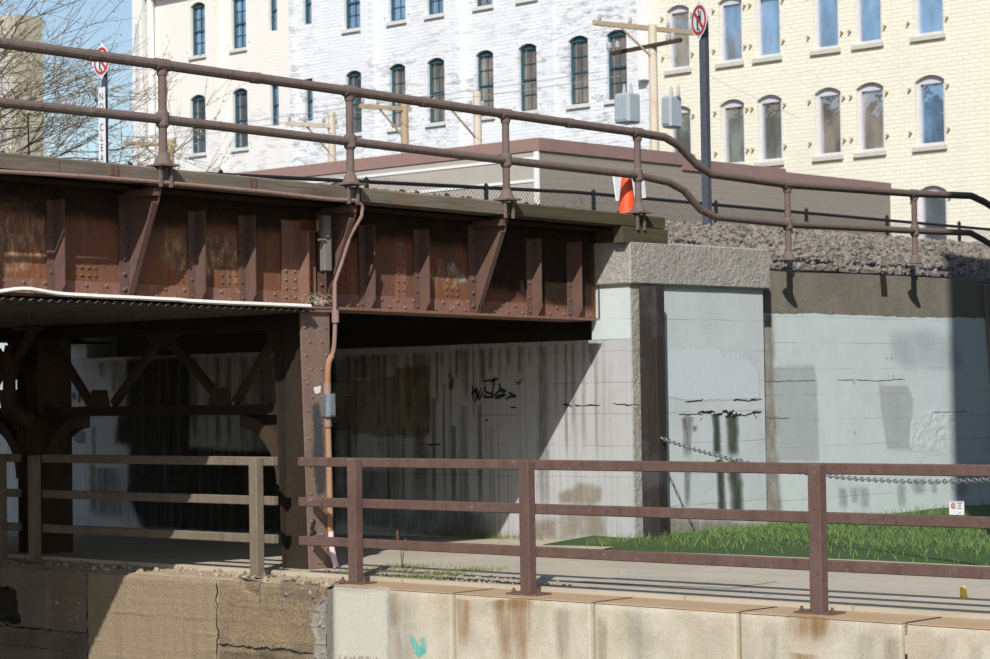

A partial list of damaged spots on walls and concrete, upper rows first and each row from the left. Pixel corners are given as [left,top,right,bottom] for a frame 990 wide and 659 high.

corrosion [0,219,45,271]
leakage [387,353,438,484]
leakage [683,417,696,451]
leakage [712,414,741,509]
leakage [536,516,603,538]
hole [0,584,21,625]
crack [0,593,88,657]
crack [215,582,314,656]
spalling [276,578,328,659]